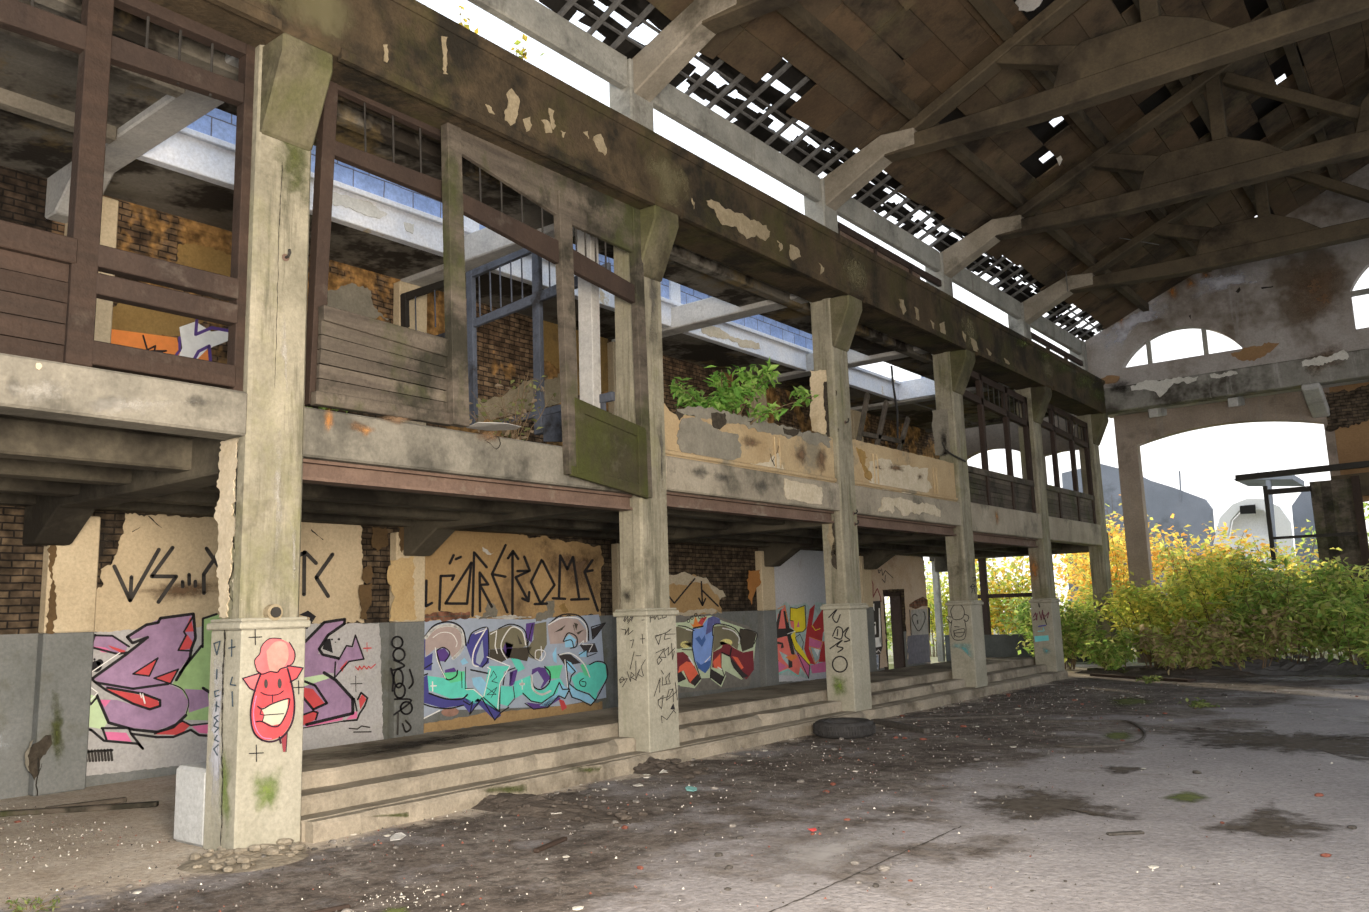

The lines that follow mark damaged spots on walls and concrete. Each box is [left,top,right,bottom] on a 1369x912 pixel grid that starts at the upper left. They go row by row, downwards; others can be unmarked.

peeling [485,88,566,138]
peeling [583,131,607,155]
peeling [691,198,801,260]
peeling [1101,342,1279,397]
peeling [1302,350,1349,366]
spalling [711,412,727,430]
spalling [783,428,801,437]
spalling [823,381,839,437]
spalling [1325,384,1369,432]
peeling [868,458,941,517]
spalling [214,437,239,619]
spalling [24,735,52,780]